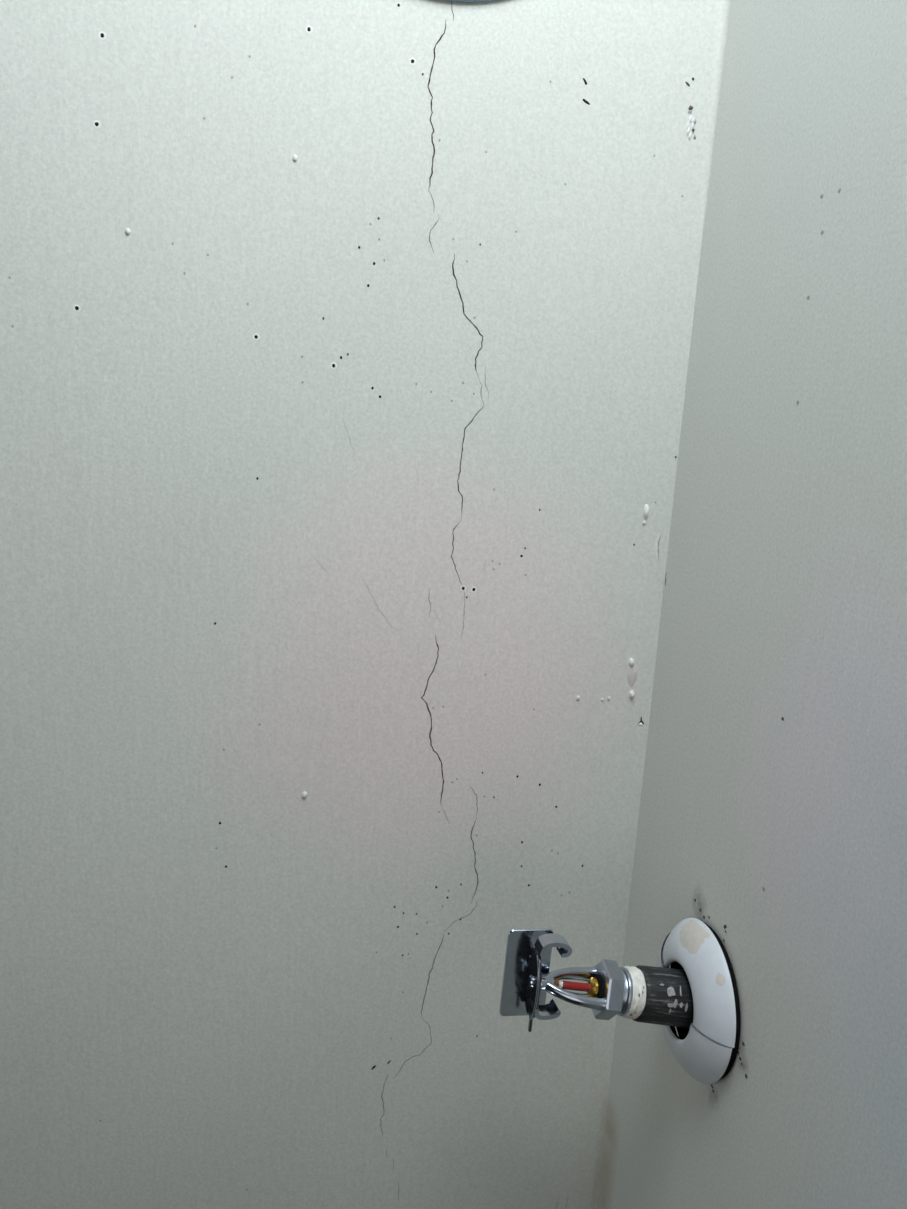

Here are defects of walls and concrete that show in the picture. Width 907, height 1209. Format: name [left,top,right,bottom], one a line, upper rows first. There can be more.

crack [380,1,489,1200]